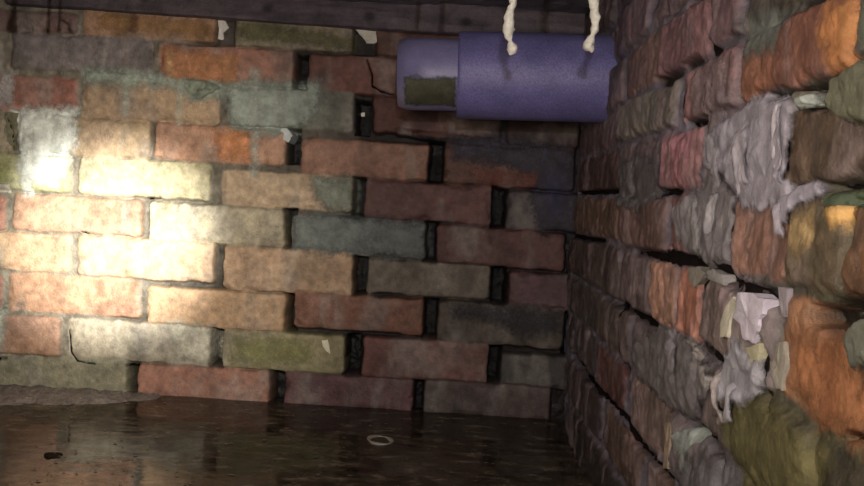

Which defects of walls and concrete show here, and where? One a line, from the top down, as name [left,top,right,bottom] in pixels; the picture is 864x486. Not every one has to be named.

crack [367,60,393,95]
crack [69,330,93,364]
flaking render [720,286,793,391]